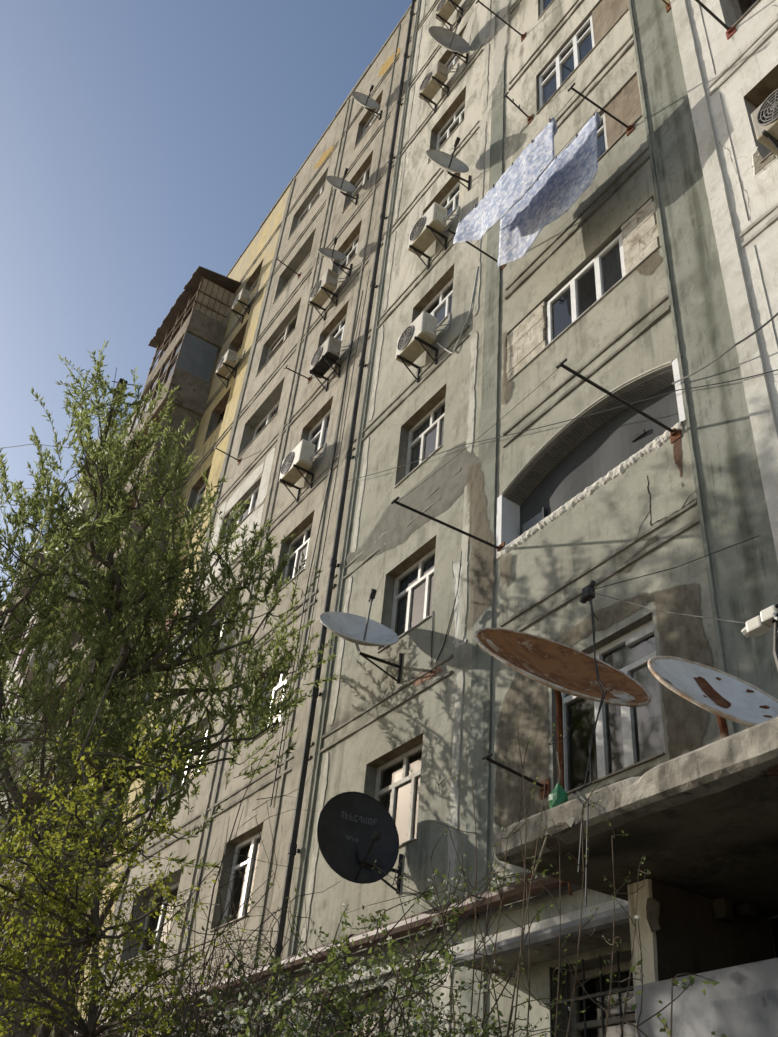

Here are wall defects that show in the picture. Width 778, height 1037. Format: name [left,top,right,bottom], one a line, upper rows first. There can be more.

rust [673,438,683,487]
crack [638,476,696,534]